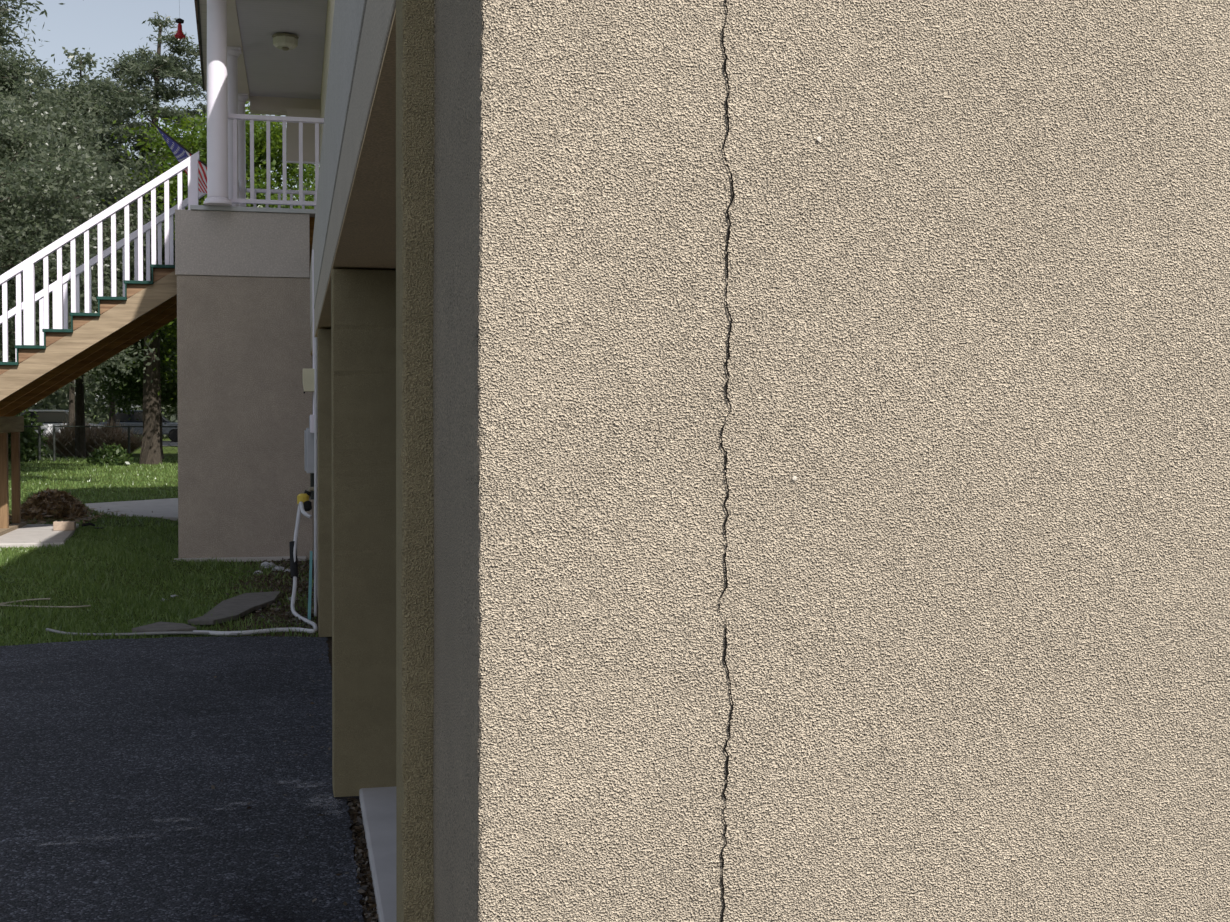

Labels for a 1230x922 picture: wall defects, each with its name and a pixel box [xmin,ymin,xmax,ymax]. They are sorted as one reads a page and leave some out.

crack [719,0,735,922]